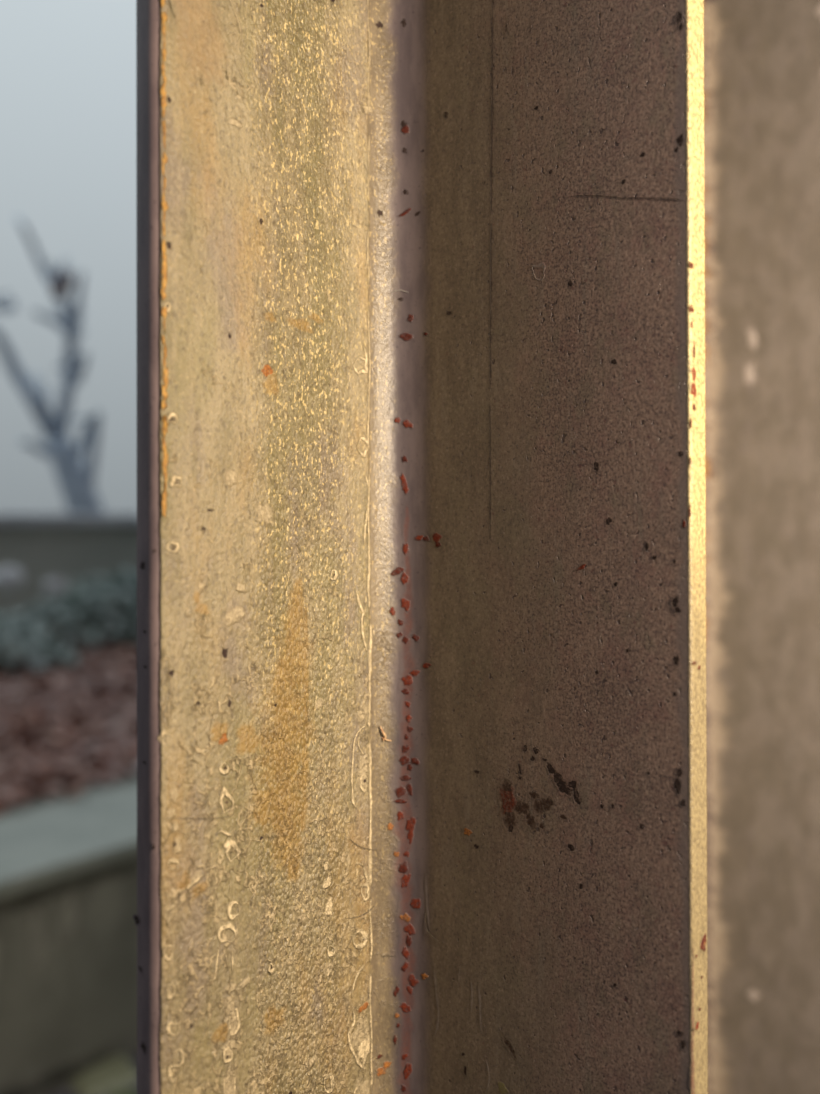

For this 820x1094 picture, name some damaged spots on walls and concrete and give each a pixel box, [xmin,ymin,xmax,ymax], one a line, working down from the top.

rust [159,0,169,520]
rust [394,416,415,429]
rust [376,454,444,1094]